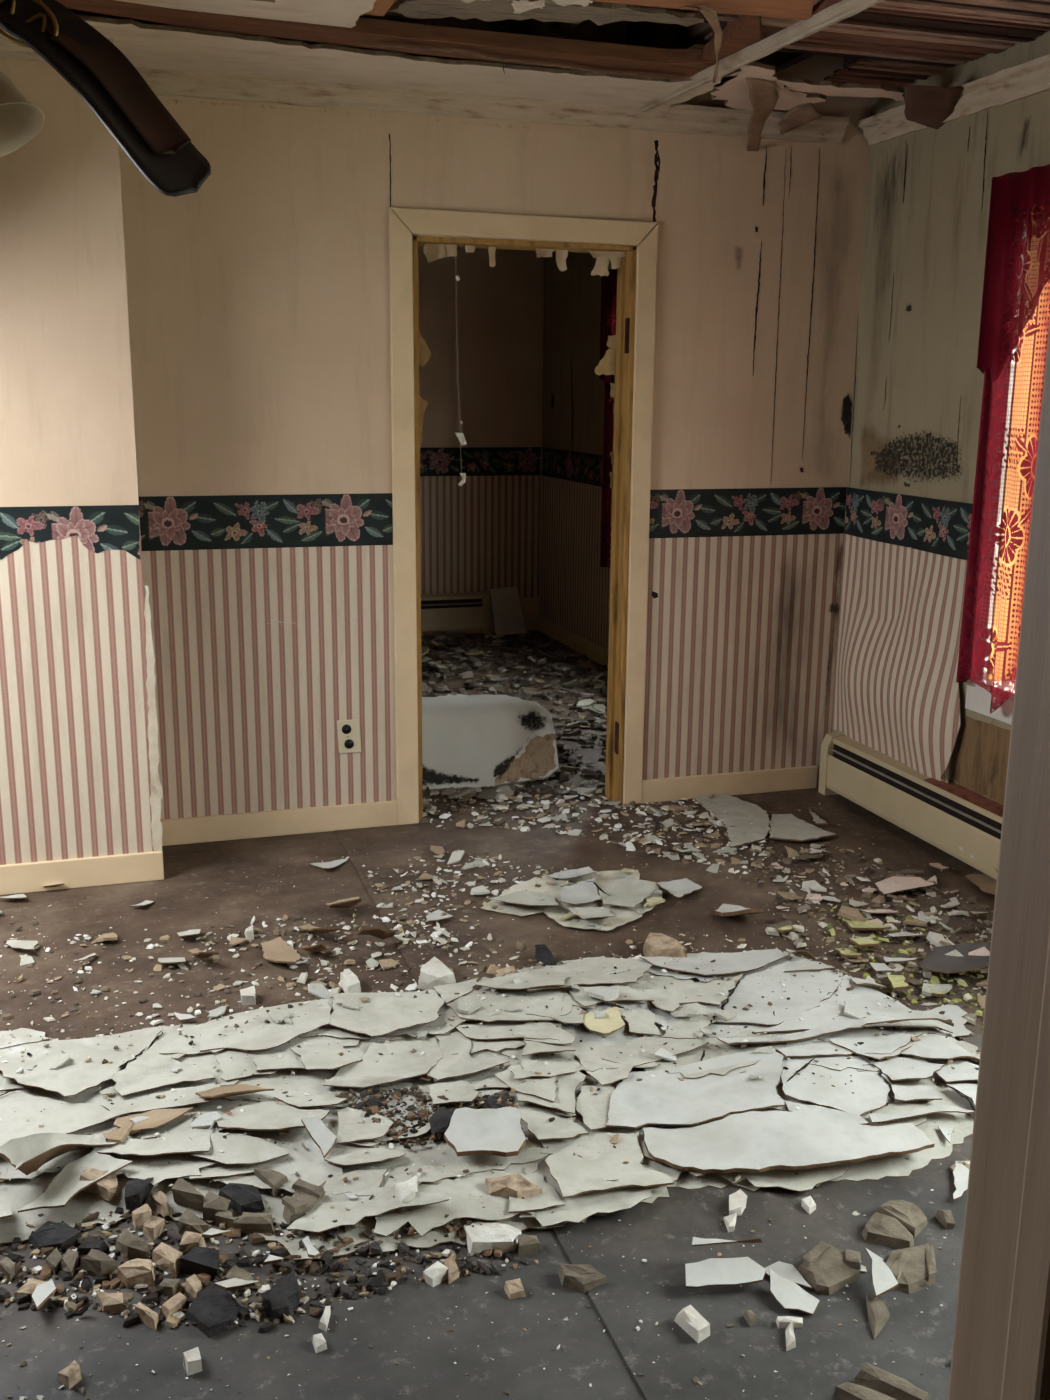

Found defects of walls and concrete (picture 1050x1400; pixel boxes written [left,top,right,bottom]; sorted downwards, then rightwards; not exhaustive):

spalling [511,0,593,14]
crack [651,140,660,222]
leakage [841,393,961,487]
peeling [953,716,1011,804]